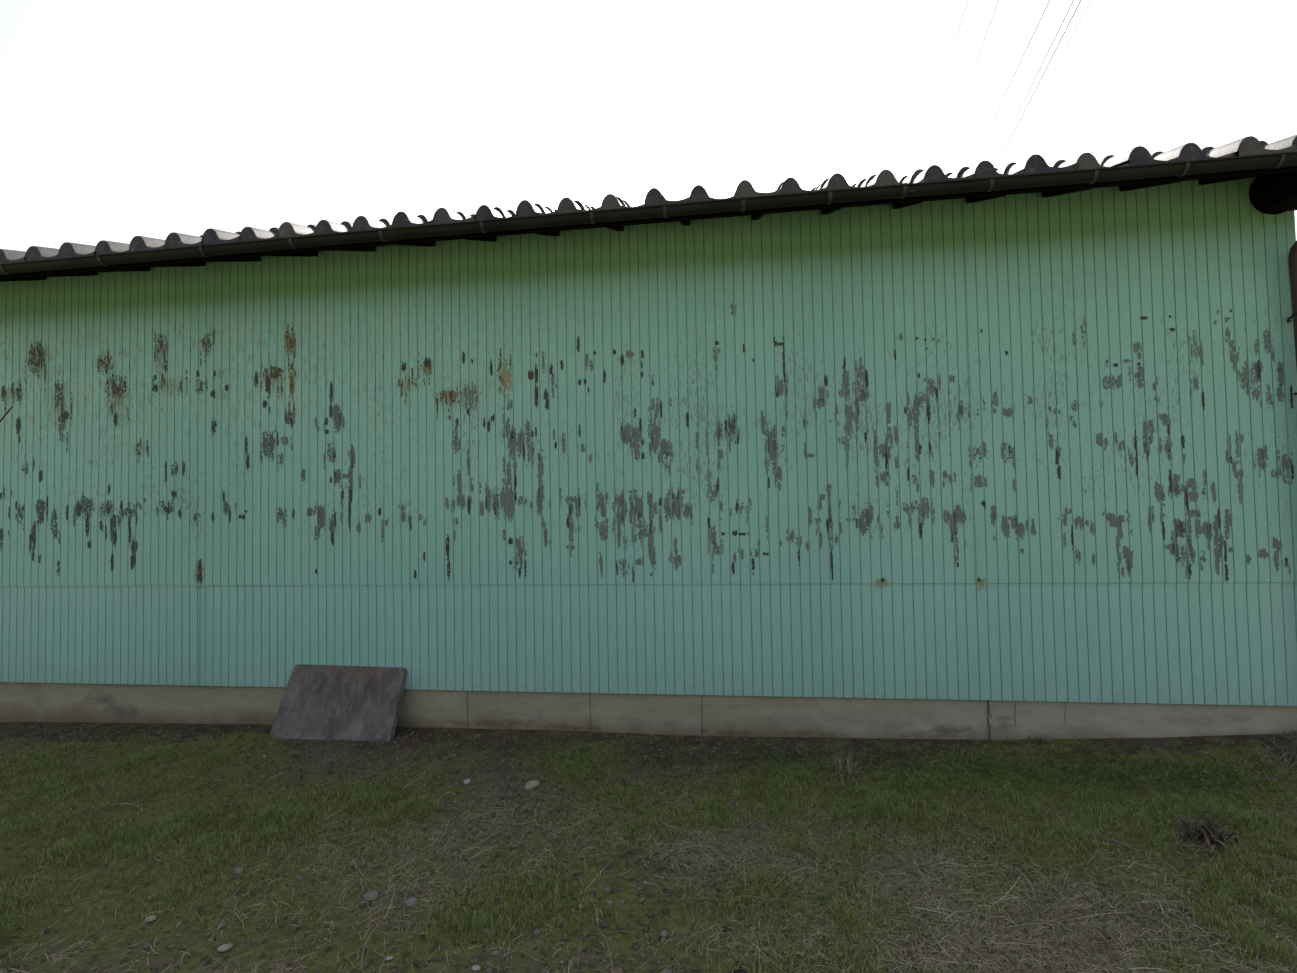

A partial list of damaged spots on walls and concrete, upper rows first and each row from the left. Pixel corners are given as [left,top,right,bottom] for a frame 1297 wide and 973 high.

peeling [196,370,229,398]
peeling [245,372,296,471]
rust [260,323,296,419]
peeling [275,381,426,546]
rust [398,352,462,420]
rust [497,348,511,396]
peeling [445,335,1036,582]
peeling [1028,396,1077,480]
peeling [1096,330,1294,581]
peeling [1214,309,1294,409]
peeling [0,457,248,572]
peeling [1058,507,1133,577]